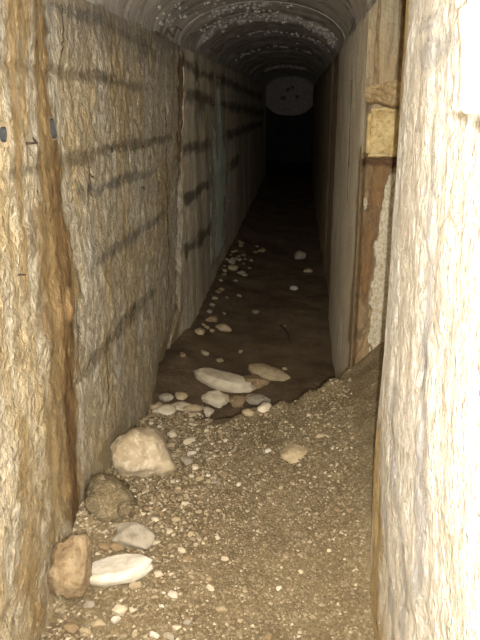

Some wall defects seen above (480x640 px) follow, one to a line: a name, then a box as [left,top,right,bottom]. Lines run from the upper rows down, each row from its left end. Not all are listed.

spalling [361,79,401,352]